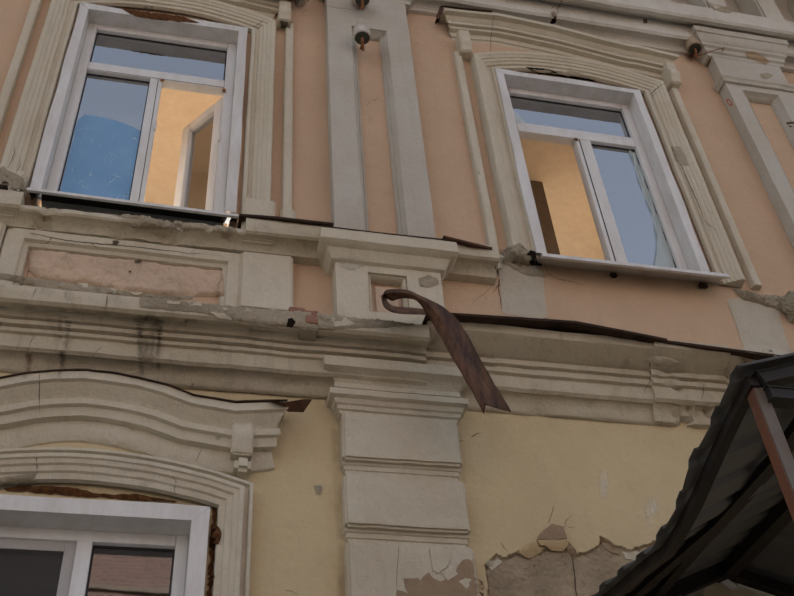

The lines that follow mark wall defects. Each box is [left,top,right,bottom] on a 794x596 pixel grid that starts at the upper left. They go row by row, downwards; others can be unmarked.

flaking render [114,214,237,234]
flaking render [0,273,202,306]
flaking render [396,524,655,596]